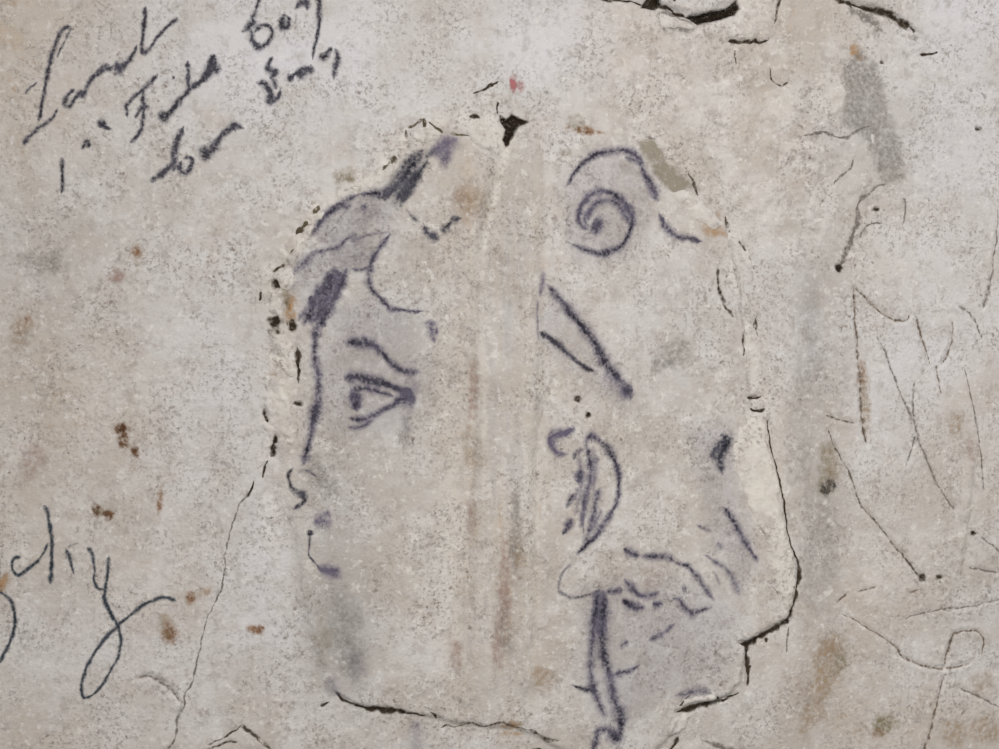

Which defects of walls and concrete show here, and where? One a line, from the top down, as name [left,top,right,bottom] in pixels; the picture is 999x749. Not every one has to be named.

flaking render [659,0,726,32]
flaking render [726,0,775,40]
crack [294,348,302,383]
corrosion [115,423,138,457]
crack [677,396,802,712]
crack [168,409,277,749]
crack [321,692,558,749]
crack [706,741,733,749]